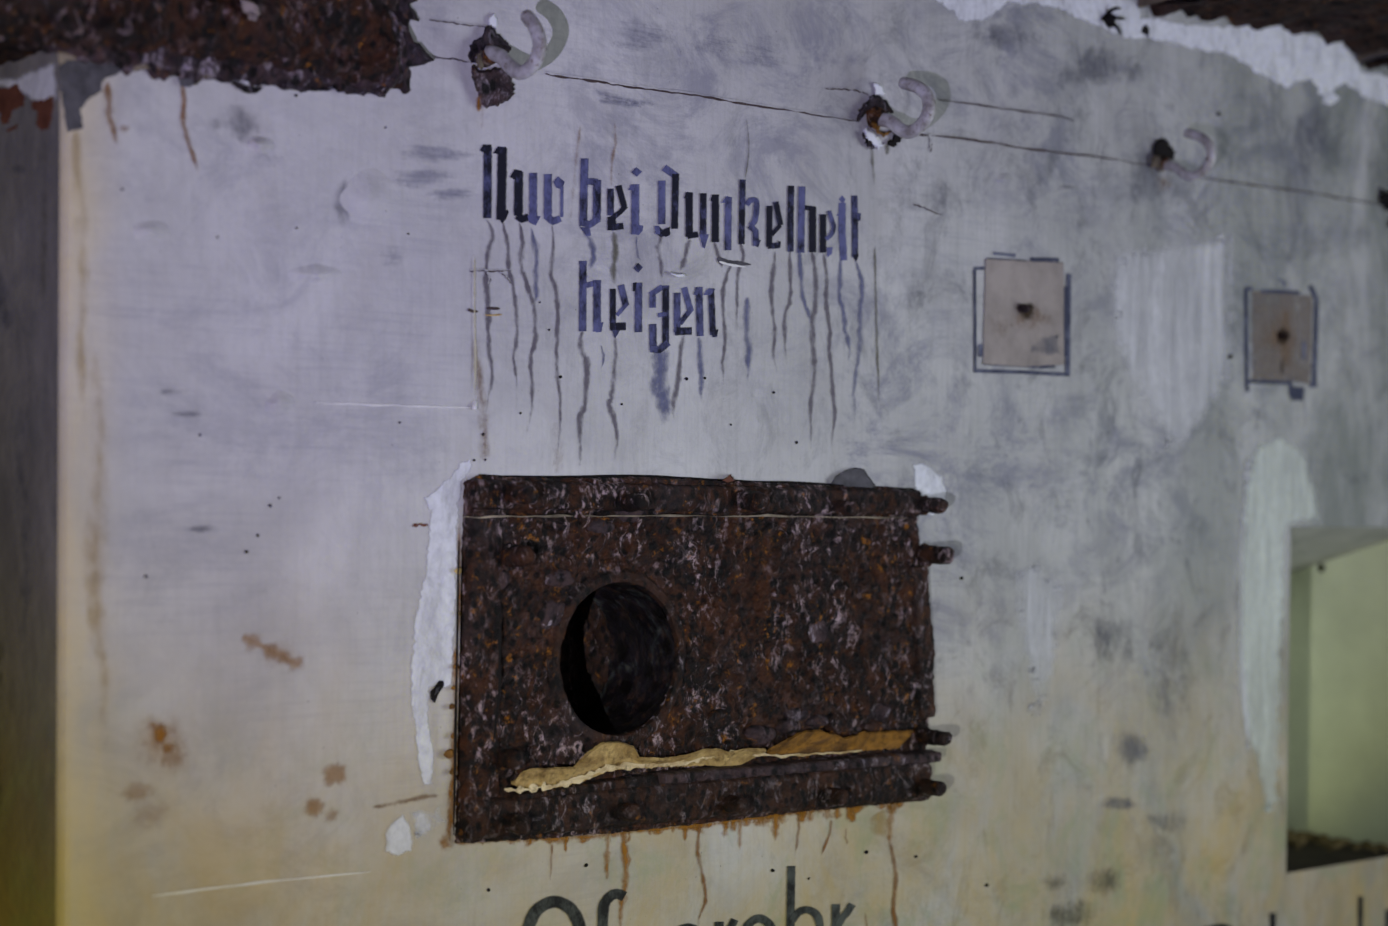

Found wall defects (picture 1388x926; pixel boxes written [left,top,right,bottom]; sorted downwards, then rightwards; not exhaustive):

peeling [0,52,121,132]
rust [41,0,434,164]
rust [537,569,575,629]
rust [808,620,829,643]
rust [152,724,171,751]
rust [825,703,892,735]
rust [441,732,465,847]
rust [518,802,904,926]